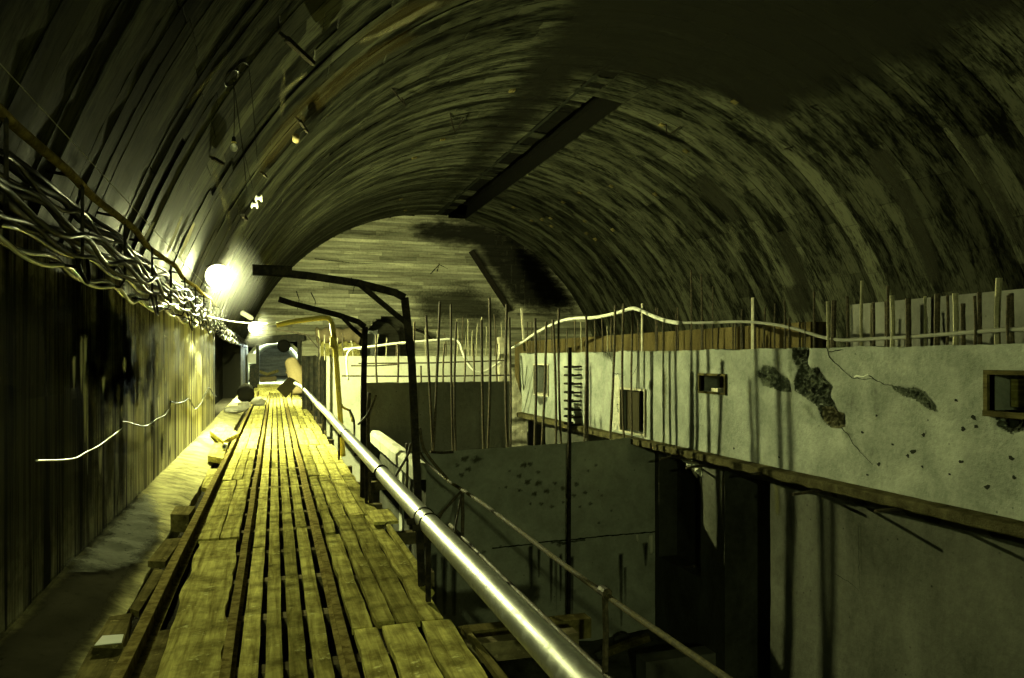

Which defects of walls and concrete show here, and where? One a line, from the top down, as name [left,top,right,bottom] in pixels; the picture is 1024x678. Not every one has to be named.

spalling [655,270,846,428]
crack [826,347,885,385]
spalling [890,384,936,412]